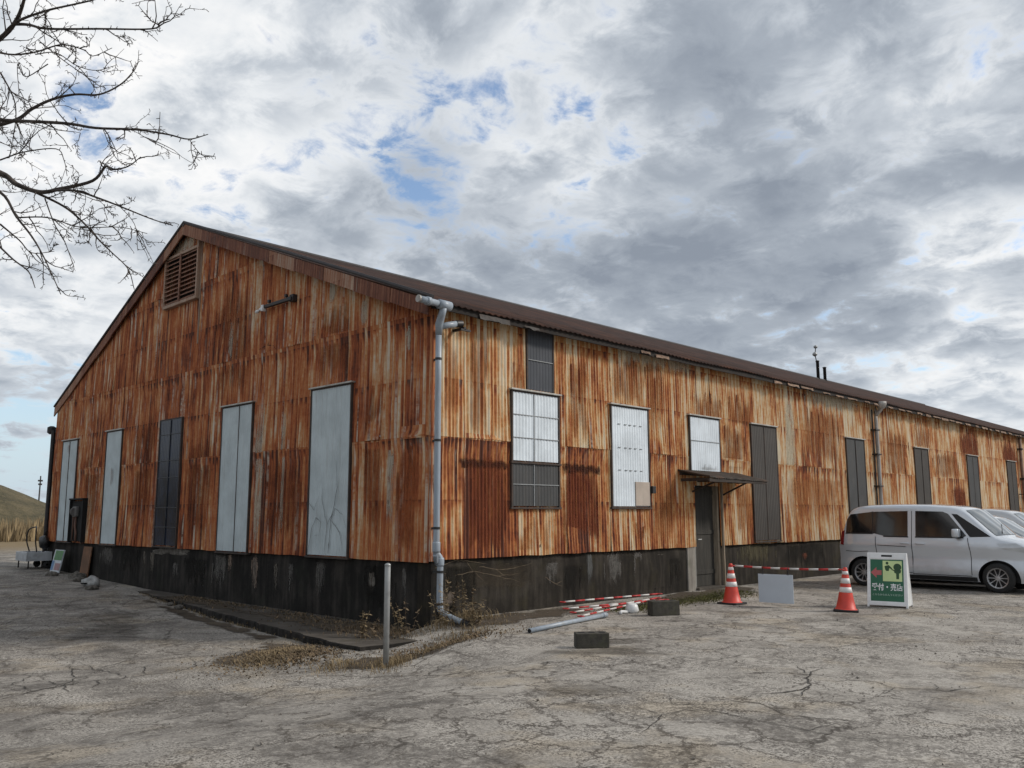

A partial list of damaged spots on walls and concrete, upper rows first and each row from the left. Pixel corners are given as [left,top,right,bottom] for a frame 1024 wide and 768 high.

corrosion [570,364,581,411]
corrosion [460,459,507,470]
corrosion [932,432,978,475]
corrosion [563,464,600,536]
corrosion [954,485,966,506]
damp [364,567,406,602]